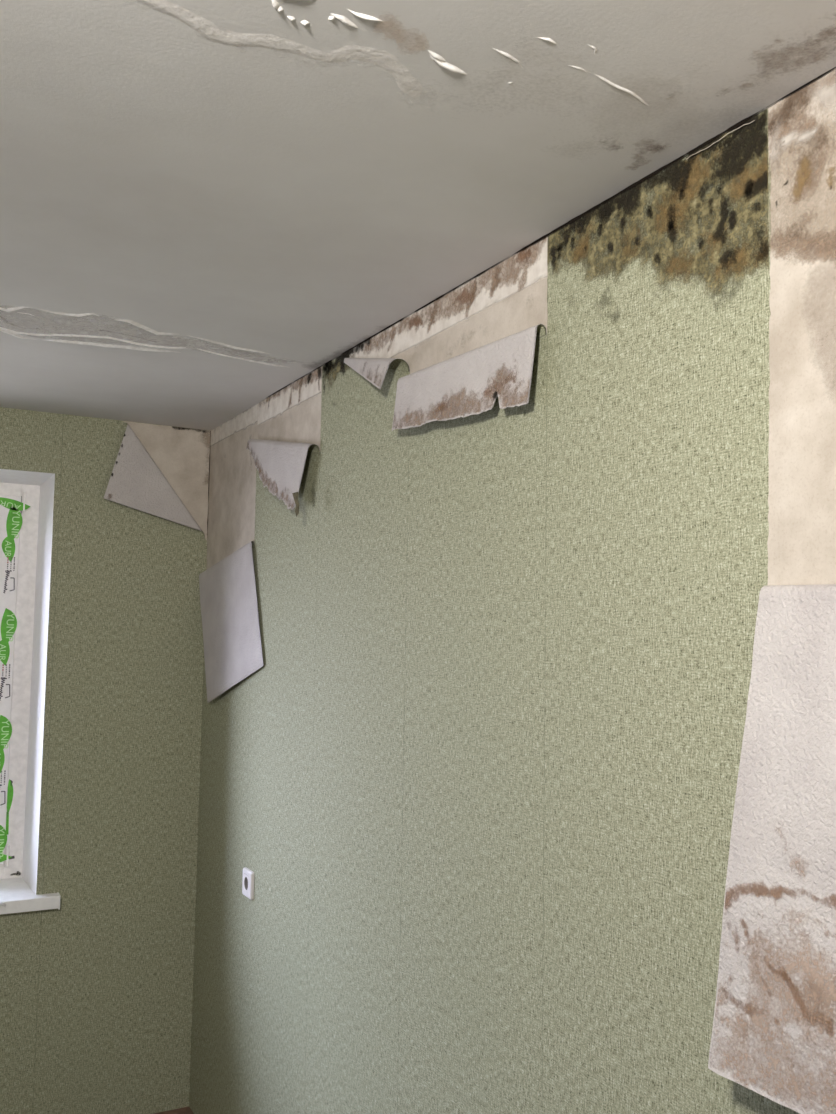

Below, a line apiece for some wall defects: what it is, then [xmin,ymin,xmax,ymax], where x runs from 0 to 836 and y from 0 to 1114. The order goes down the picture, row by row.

flaking render [349,236,548,374]
leakage [266,71,836,407]
flaking render [123,367,322,570]
leakage [725,884,791,907]
leakage [715,920,836,1107]